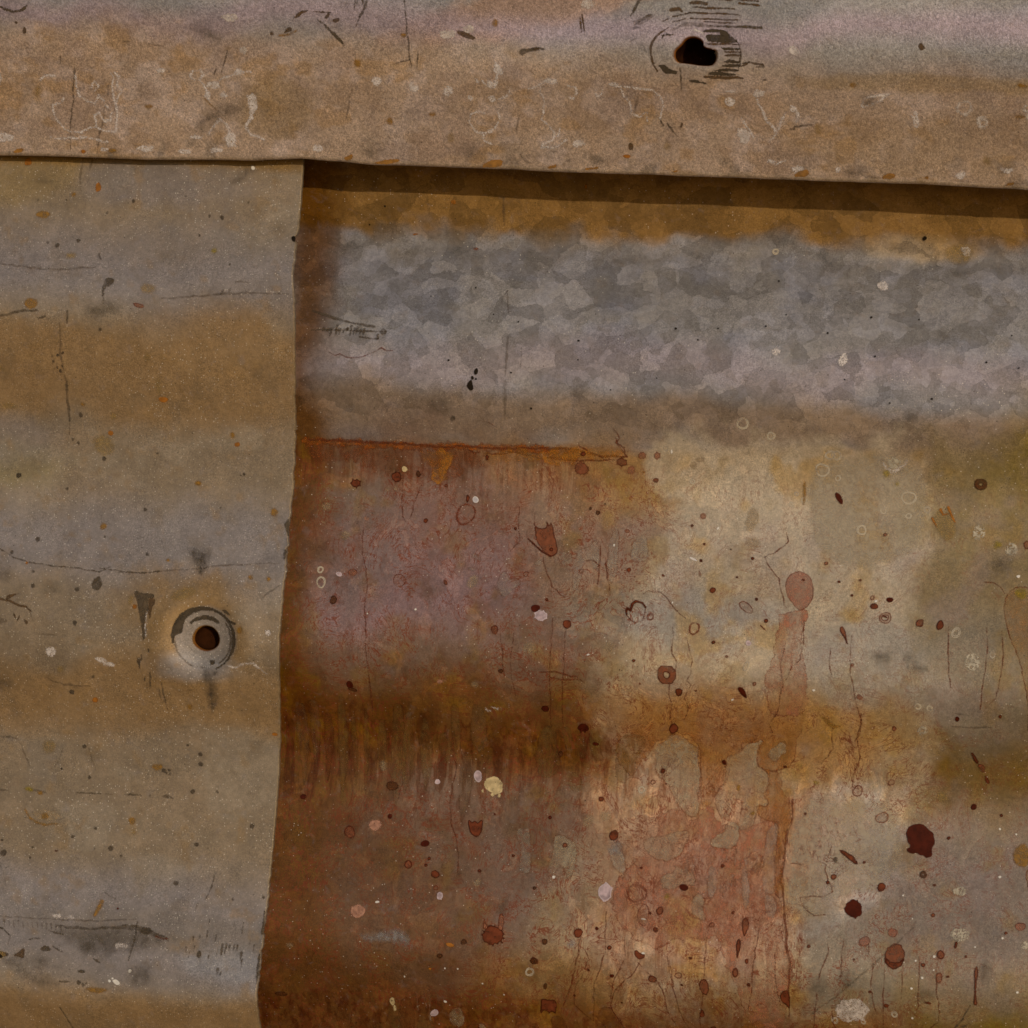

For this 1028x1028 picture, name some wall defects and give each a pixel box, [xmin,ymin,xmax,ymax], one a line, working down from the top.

corrosion [302,437,660,487]
corrosion [528,522,558,557]
corrosion [625,600,654,621]
corrosion [870,596,893,624]
corrosion [658,665,697,696]
corrosion [738,678,803,717]
corrosion [906,824,950,858]
corrosion [611,766,806,1027]
corrosion [844,899,862,919]
corrosion [482,914,505,946]
corrosion [885,929,905,970]
corrosion [937,942,978,1006]